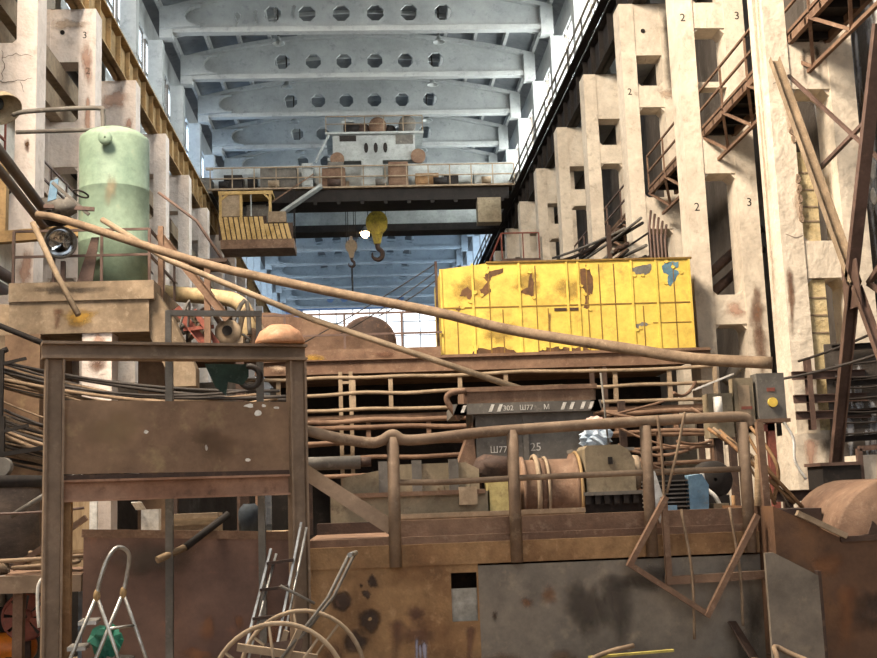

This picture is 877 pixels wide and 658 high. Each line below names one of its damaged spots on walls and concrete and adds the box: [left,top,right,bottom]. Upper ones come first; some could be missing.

crack [0,51,33,92]
rust [730,291,765,356]